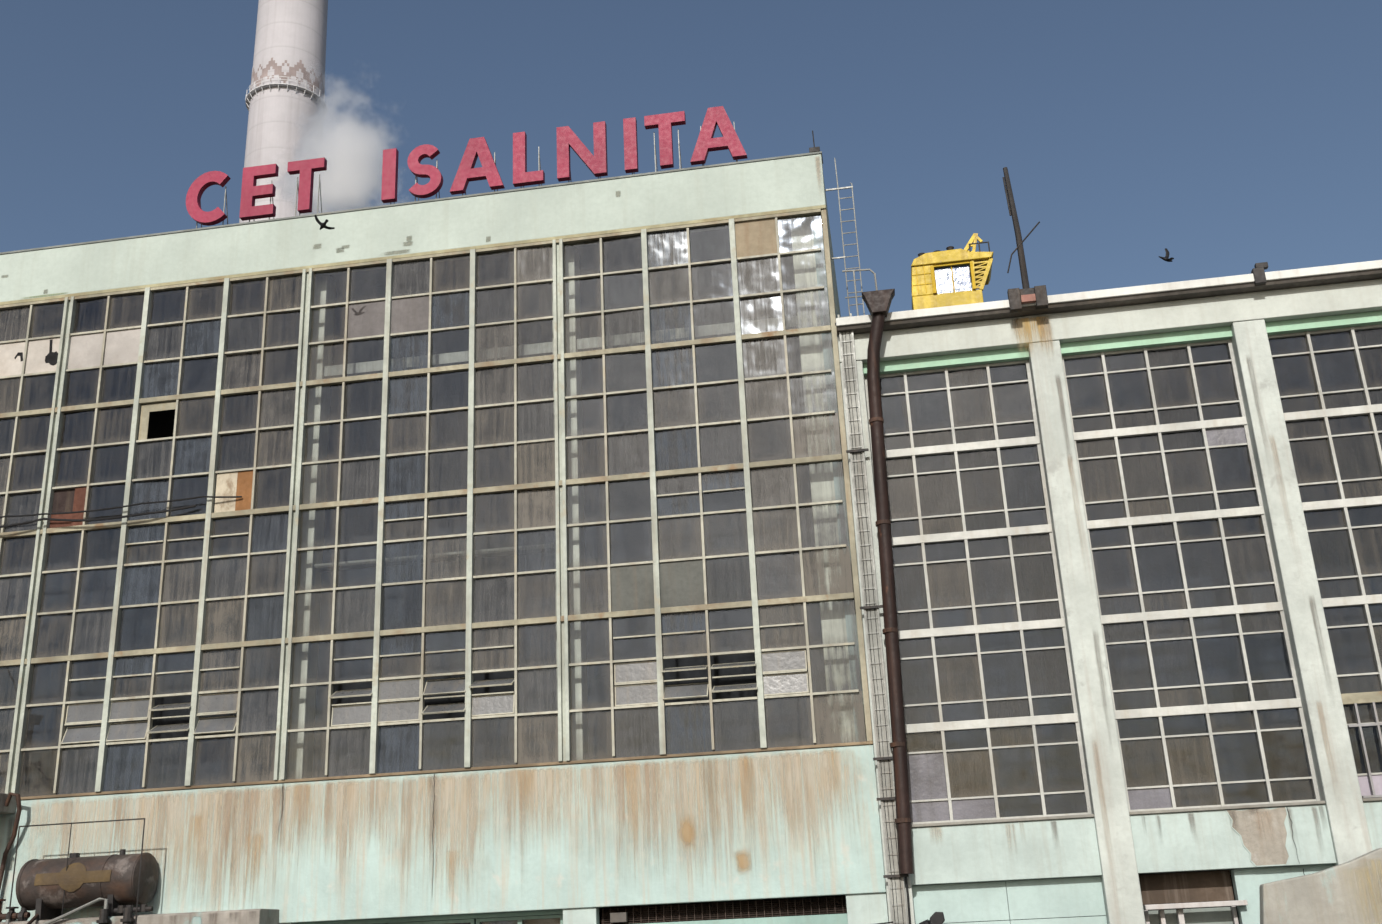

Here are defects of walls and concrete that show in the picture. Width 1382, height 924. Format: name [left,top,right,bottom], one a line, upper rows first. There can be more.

corrosion [1015,317,1045,341]
corrosion [215,785,338,851]
corrosion [737,854,749,869]
spalling [1225,807,1290,867]